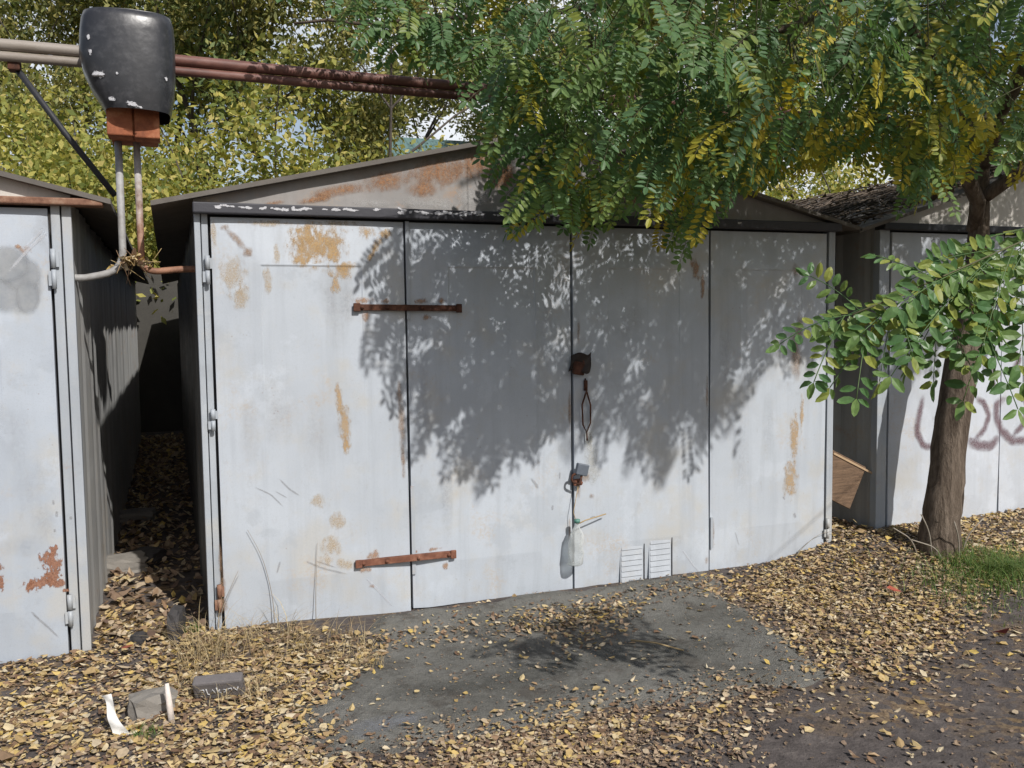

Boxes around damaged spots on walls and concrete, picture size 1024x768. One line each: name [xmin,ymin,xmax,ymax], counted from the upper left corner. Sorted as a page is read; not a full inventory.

corrosion [415,151,513,195]
peeling [215,204,358,212]
peeling [397,207,508,216]
corrosion [290,222,354,291]
corrosion [337,386,350,452]
corrosion [785,402,804,494]